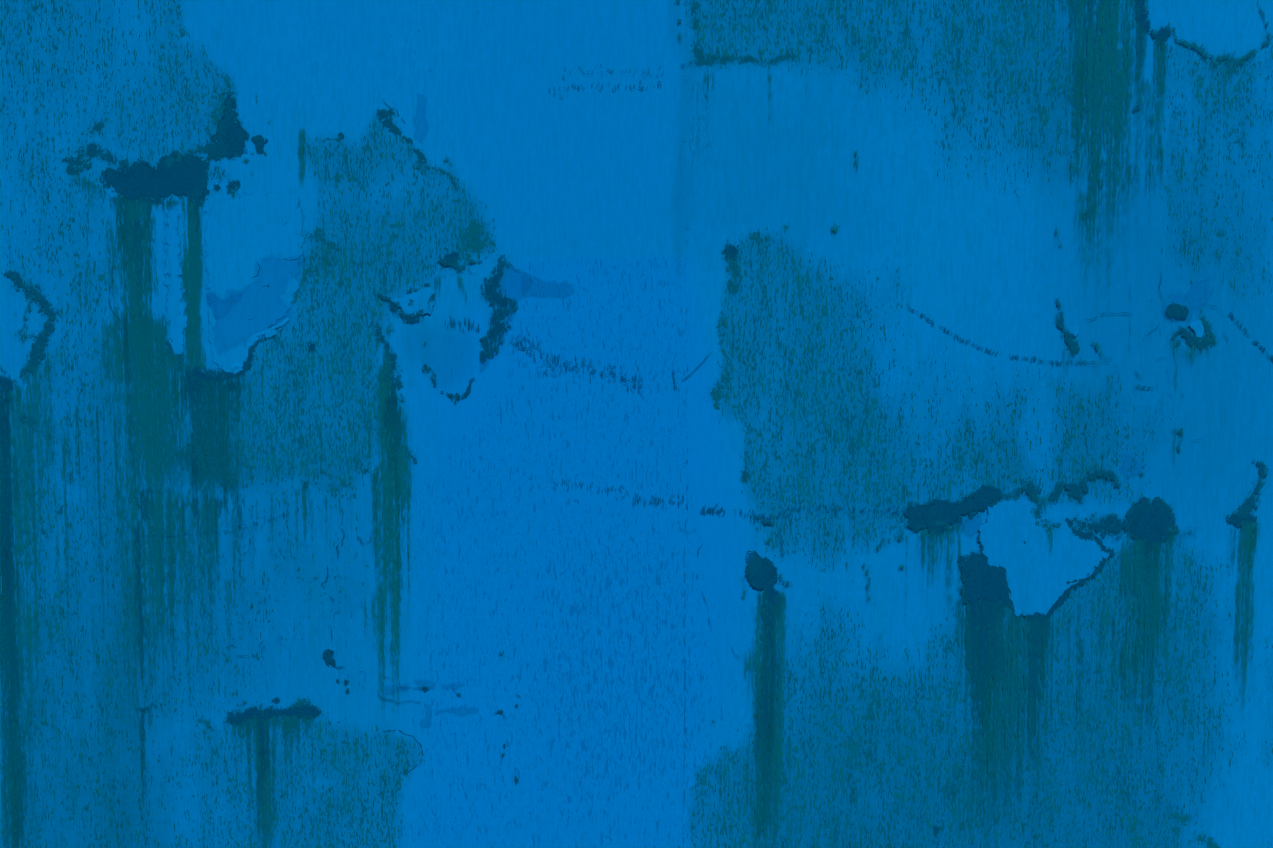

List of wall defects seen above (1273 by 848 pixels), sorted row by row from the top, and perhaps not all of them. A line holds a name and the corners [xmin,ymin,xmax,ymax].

peeling [376,102,457,189]
peeling [62,92,346,378]
peeling [376,252,539,363]
peeling [422,363,476,403]
peeling [902,468,1199,697]